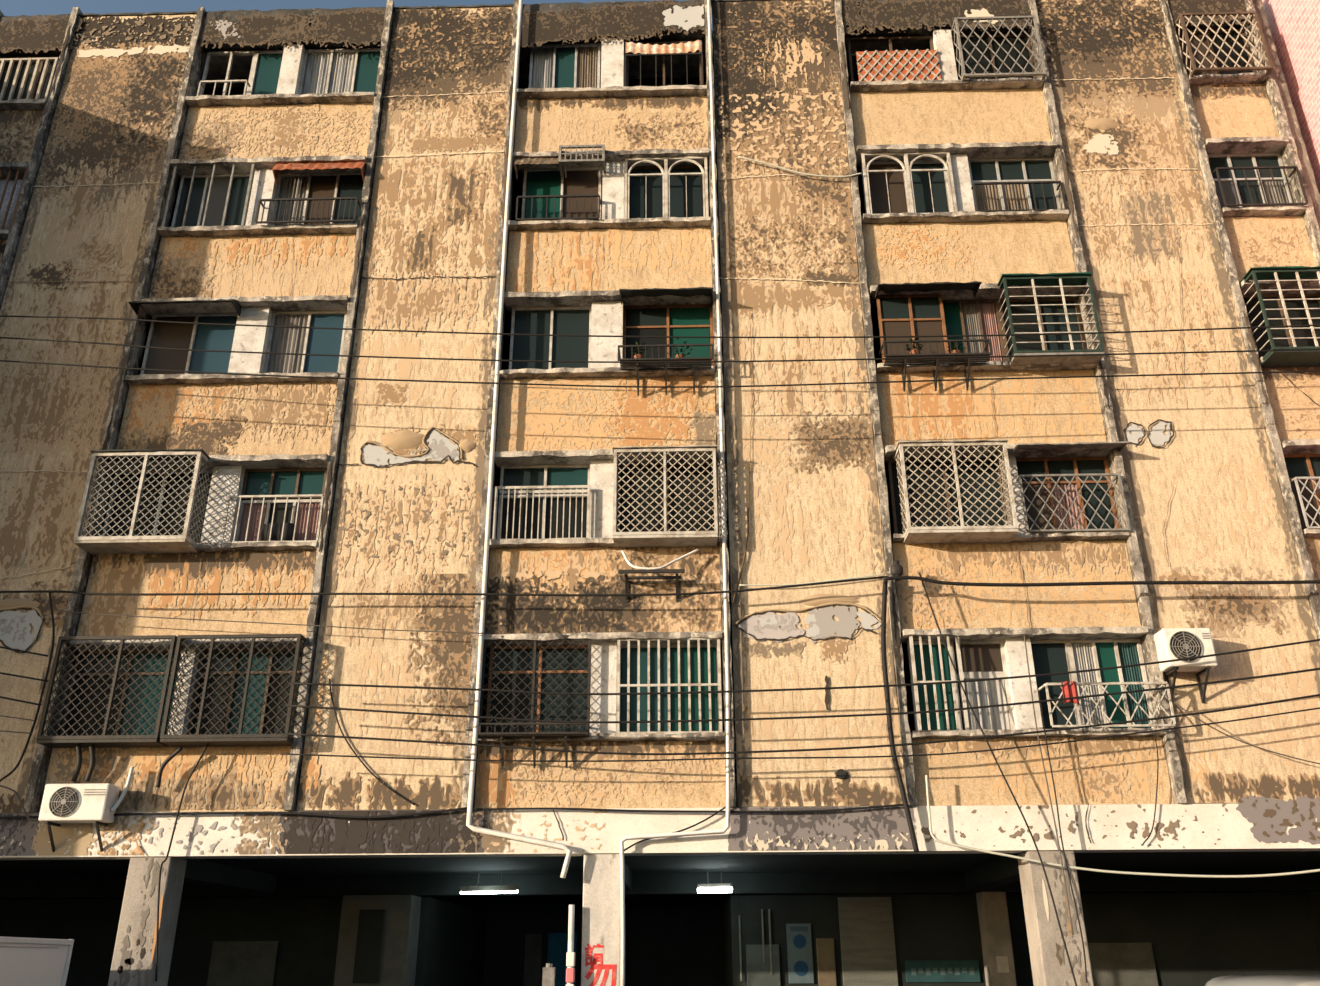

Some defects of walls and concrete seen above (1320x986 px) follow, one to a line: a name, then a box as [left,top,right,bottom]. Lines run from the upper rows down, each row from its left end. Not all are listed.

peeling [662,4,705,31]
water stain [479,0,1320,807]
water stain [0,7,708,856]
peeling [362,429,459,467]
peeling [1125,420,1173,447]
peeling [0,609,43,651]
peeling [737,605,881,643]
spalling [993,795,1320,848]